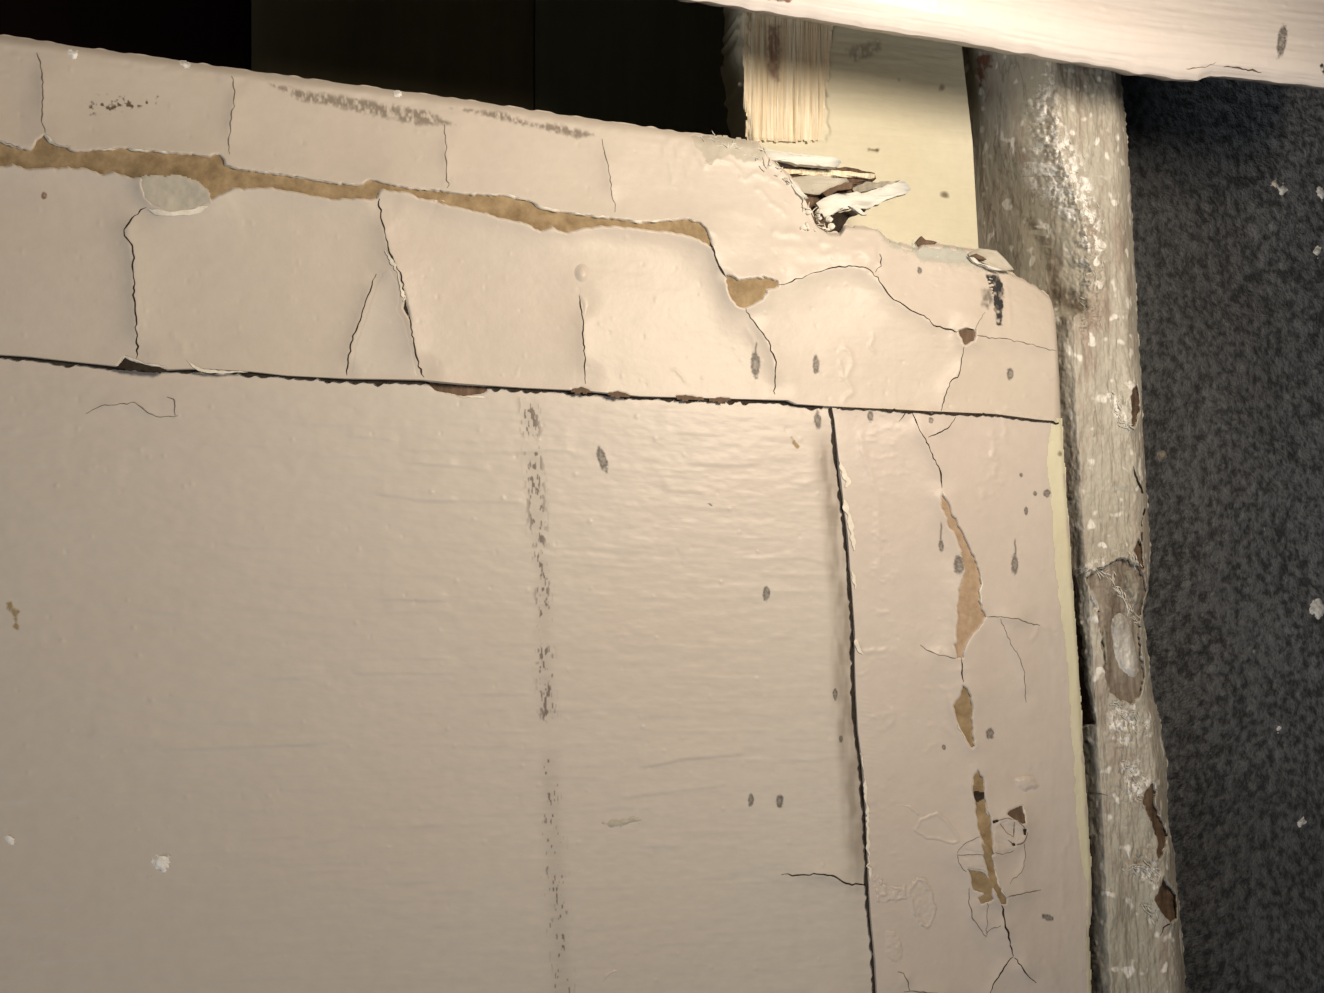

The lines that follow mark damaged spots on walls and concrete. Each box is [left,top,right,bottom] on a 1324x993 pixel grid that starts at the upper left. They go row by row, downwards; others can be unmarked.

crack [37,54,46,133]
crack [227,76,235,154]
peeling [0,135,710,245]
crack [442,124,450,188]
peeling [726,275,778,308]
crack [0,199,1059,993]
peeling [942,491,985,658]
peeling [954,687,974,747]
peeling [1047,418,1148,993]
peeling [961,771,1027,904]
spalling [1121,760,1176,923]